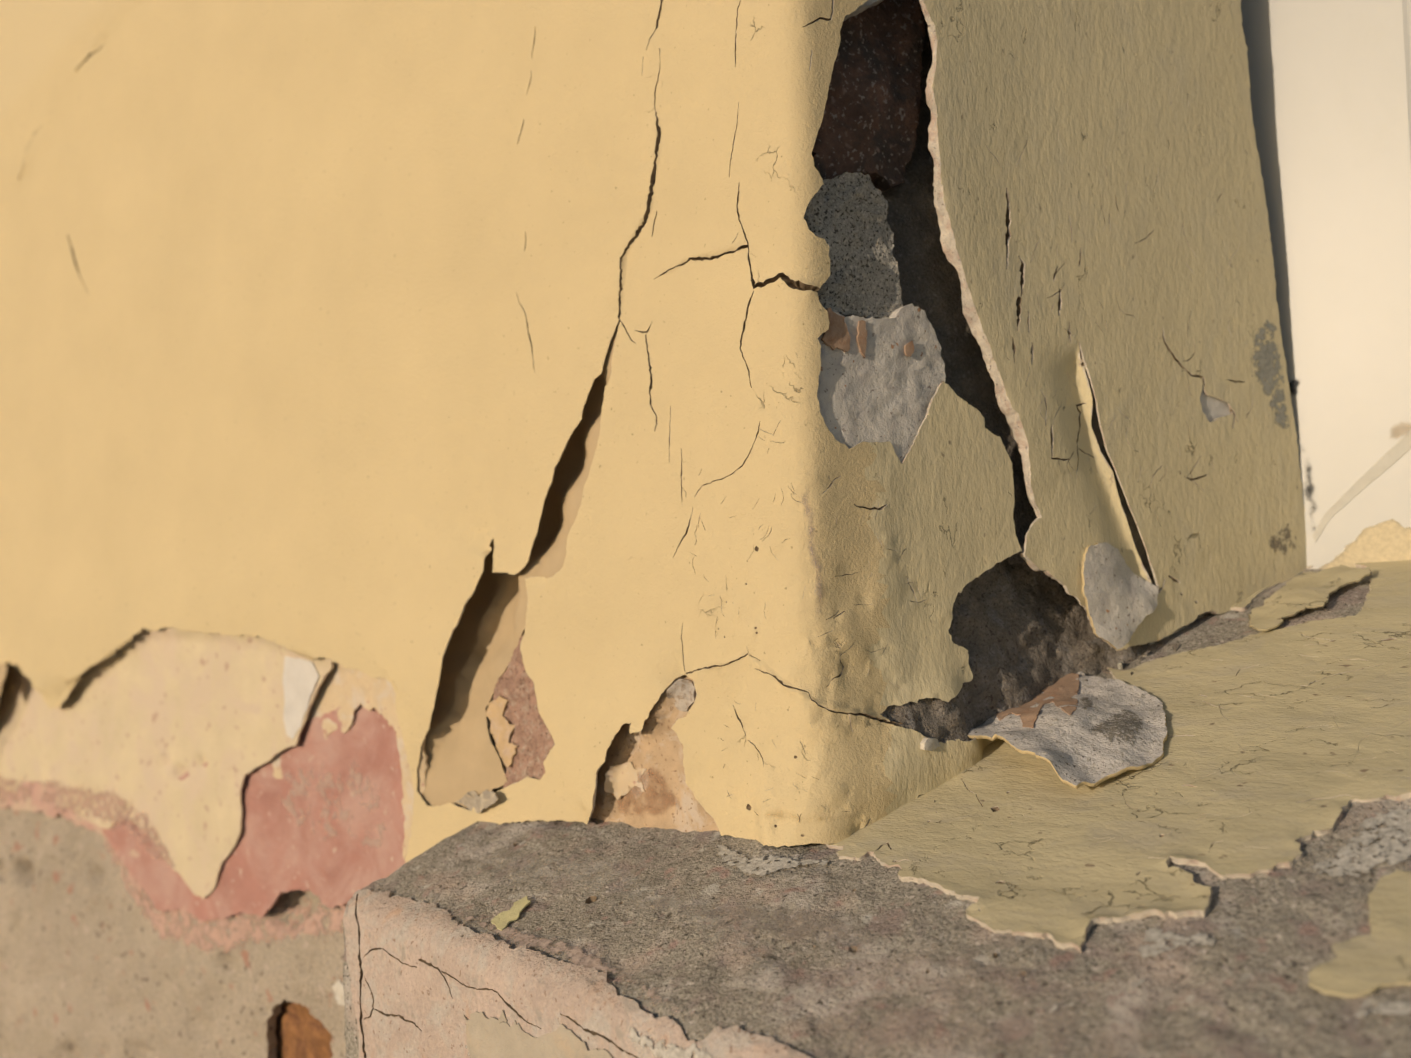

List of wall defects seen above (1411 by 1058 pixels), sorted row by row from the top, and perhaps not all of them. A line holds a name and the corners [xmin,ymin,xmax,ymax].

crack [516,293,535,373]
crack [618,0,1249,820]
flaking render [873,368,1159,751]
flaking render [0,320,844,1058]
crack [355,893,638,1058]
peeling [1137,927,1215,958]
peeling [1308,805,1411,1019]